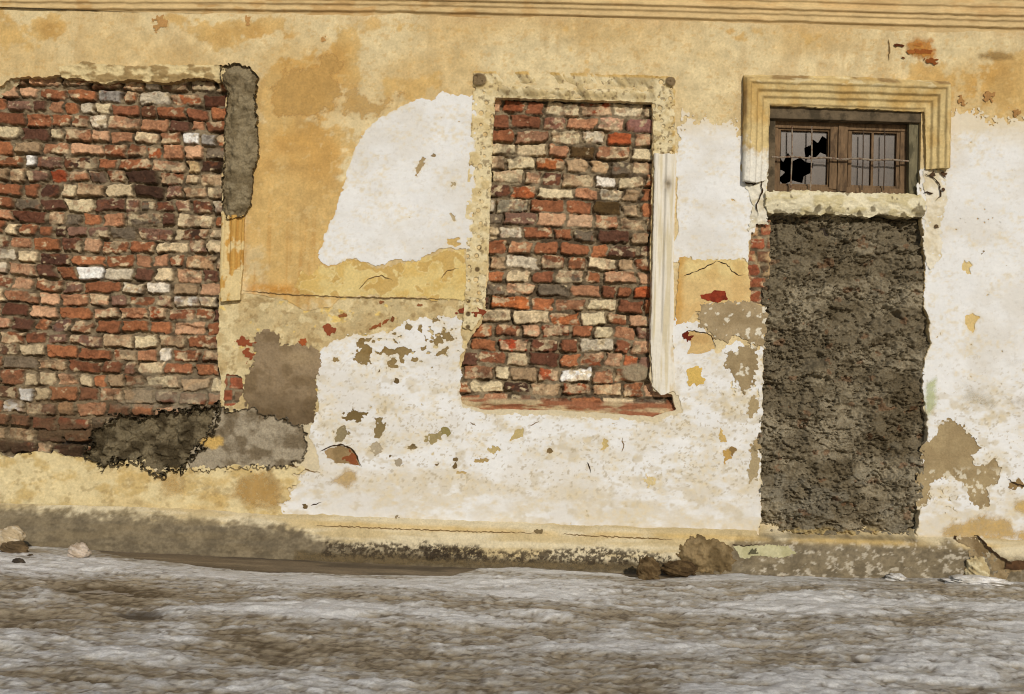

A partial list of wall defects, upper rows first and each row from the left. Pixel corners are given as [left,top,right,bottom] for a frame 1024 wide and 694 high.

flaking render [0,77,487,457]
peeling [674,173,771,418]
spalling [922,170,948,275]
peeling [965,313,980,333]
peeling [321,405,451,467]
peeling [452,428,524,474]
peeling [719,428,762,484]
peeling [915,418,1002,510]